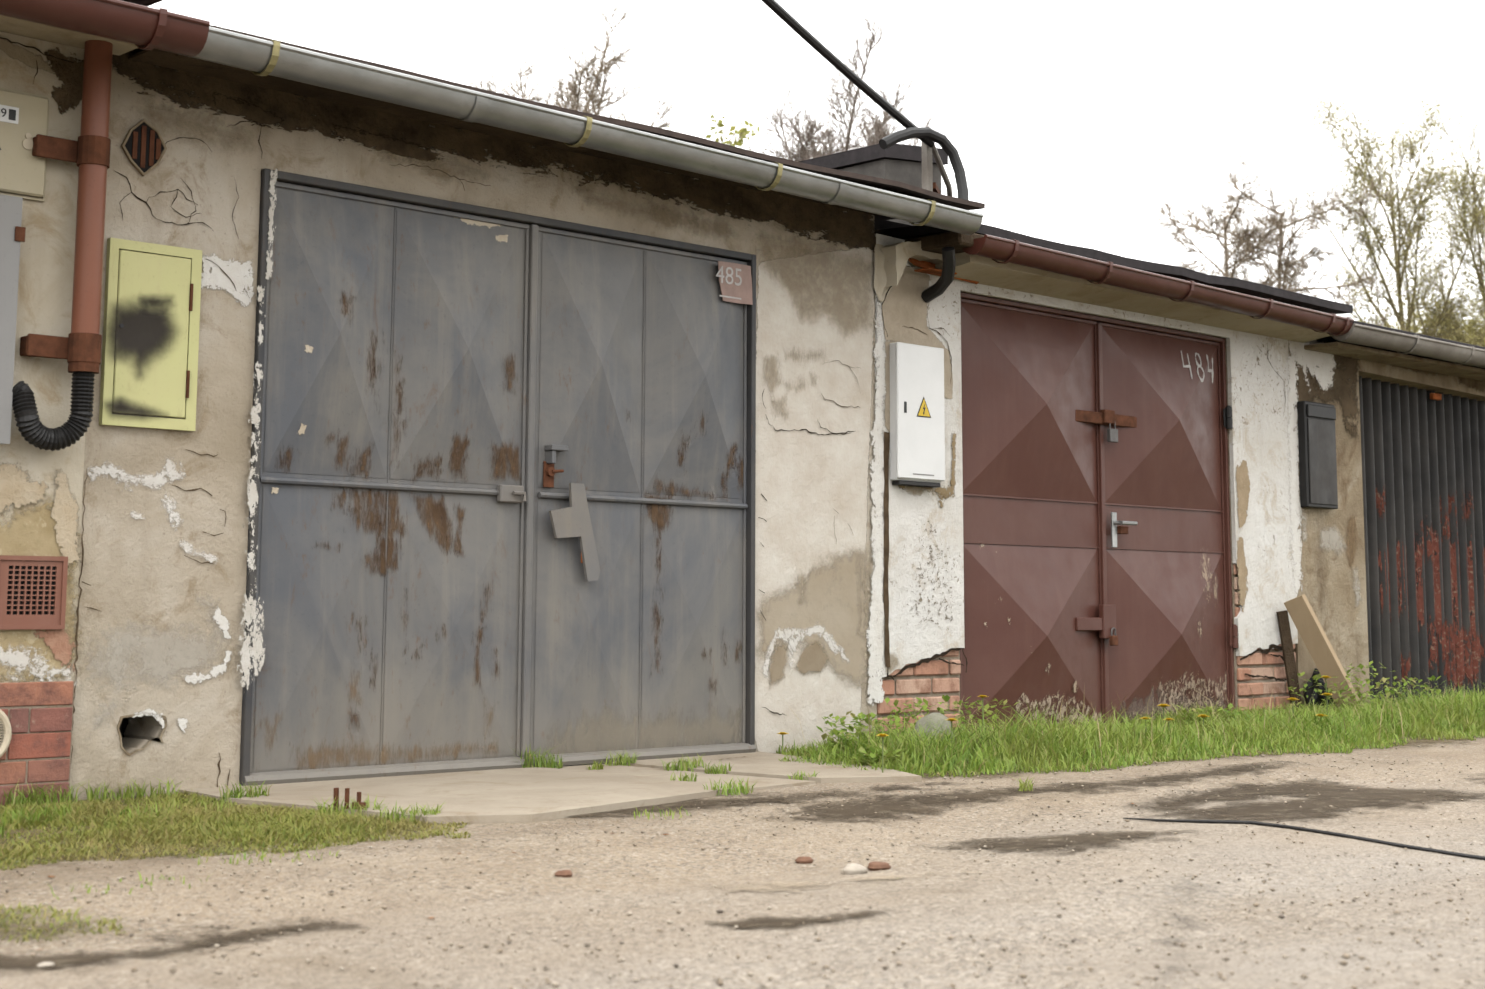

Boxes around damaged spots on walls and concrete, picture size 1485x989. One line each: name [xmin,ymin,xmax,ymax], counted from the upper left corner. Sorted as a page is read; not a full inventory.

spalling [43,47,84,115]
peeling [0,462,82,682]
peeling [201,169,279,689]
corrosion [328,436,404,575]
corrosion [413,435,469,554]
corrosion [492,444,521,480]
corrosion [647,445,743,567]
water stain [759,551,870,687]
peeling [866,265,953,705]
spalling [117,709,188,756]